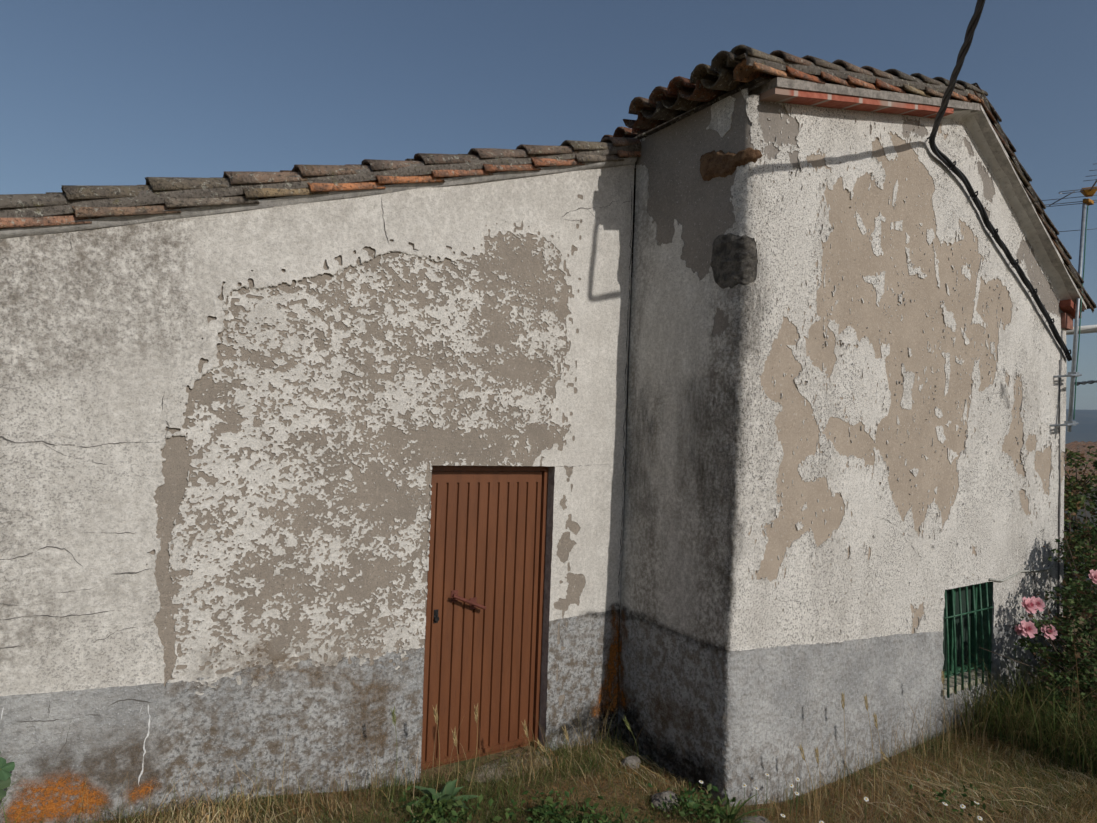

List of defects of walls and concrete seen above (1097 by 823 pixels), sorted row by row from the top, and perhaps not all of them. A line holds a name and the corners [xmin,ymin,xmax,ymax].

crack [0,532,140,641]
peeling [146,219,586,686]
corrosion [593,613,627,716]
peeling [636,91,1065,600]